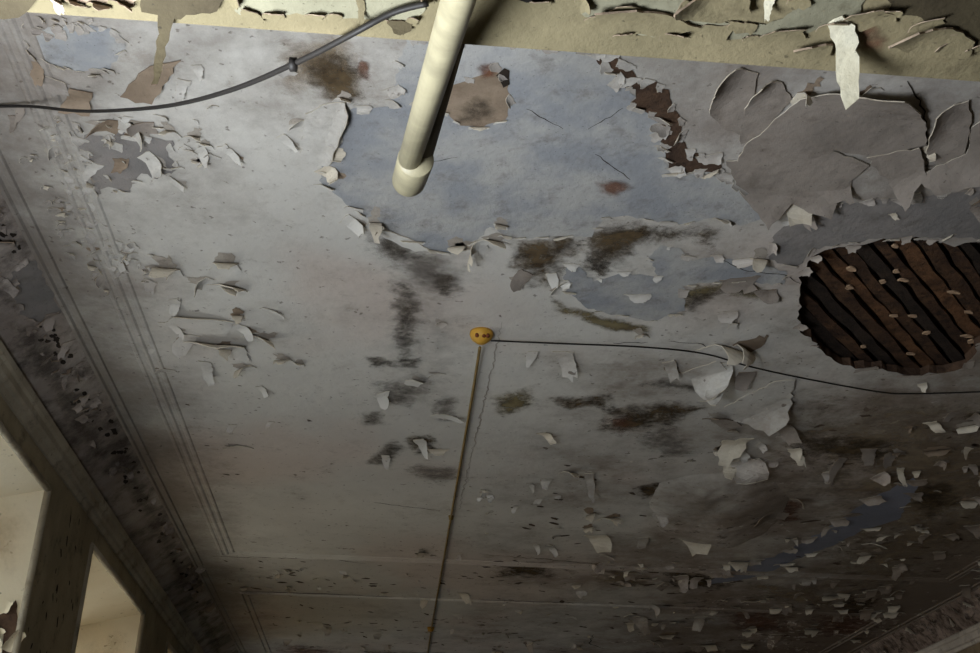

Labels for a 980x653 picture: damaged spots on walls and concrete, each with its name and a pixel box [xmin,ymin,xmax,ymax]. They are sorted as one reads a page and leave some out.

leakage [286,41,368,99]
peeling [0,0,980,387]
leakage [381,239,451,295]
leakage [512,226,676,282]
leakage [554,301,647,331]
peeling [26,311,118,448]
peeling [376,391,391,410]
leakage [374,436,435,464]
peeling [413,439,449,459]
leakage [498,393,530,414]
leakage [555,394,703,454]
peeling [526,411,980,653]